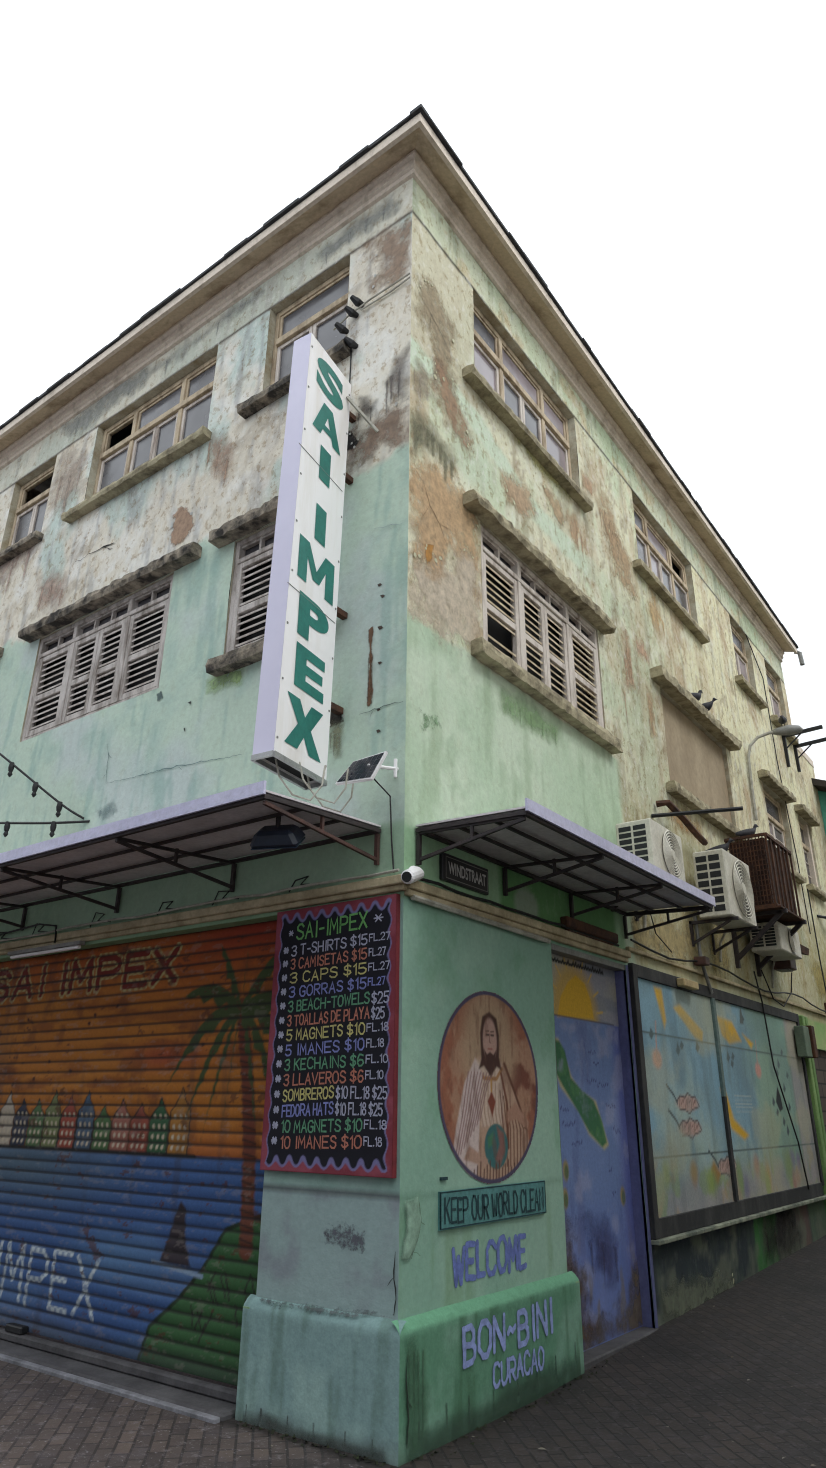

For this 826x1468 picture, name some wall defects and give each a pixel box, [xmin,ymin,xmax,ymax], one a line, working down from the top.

peeling [368,218,412,288]
peeling [417,279,471,448]
peeling [408,463,481,643]